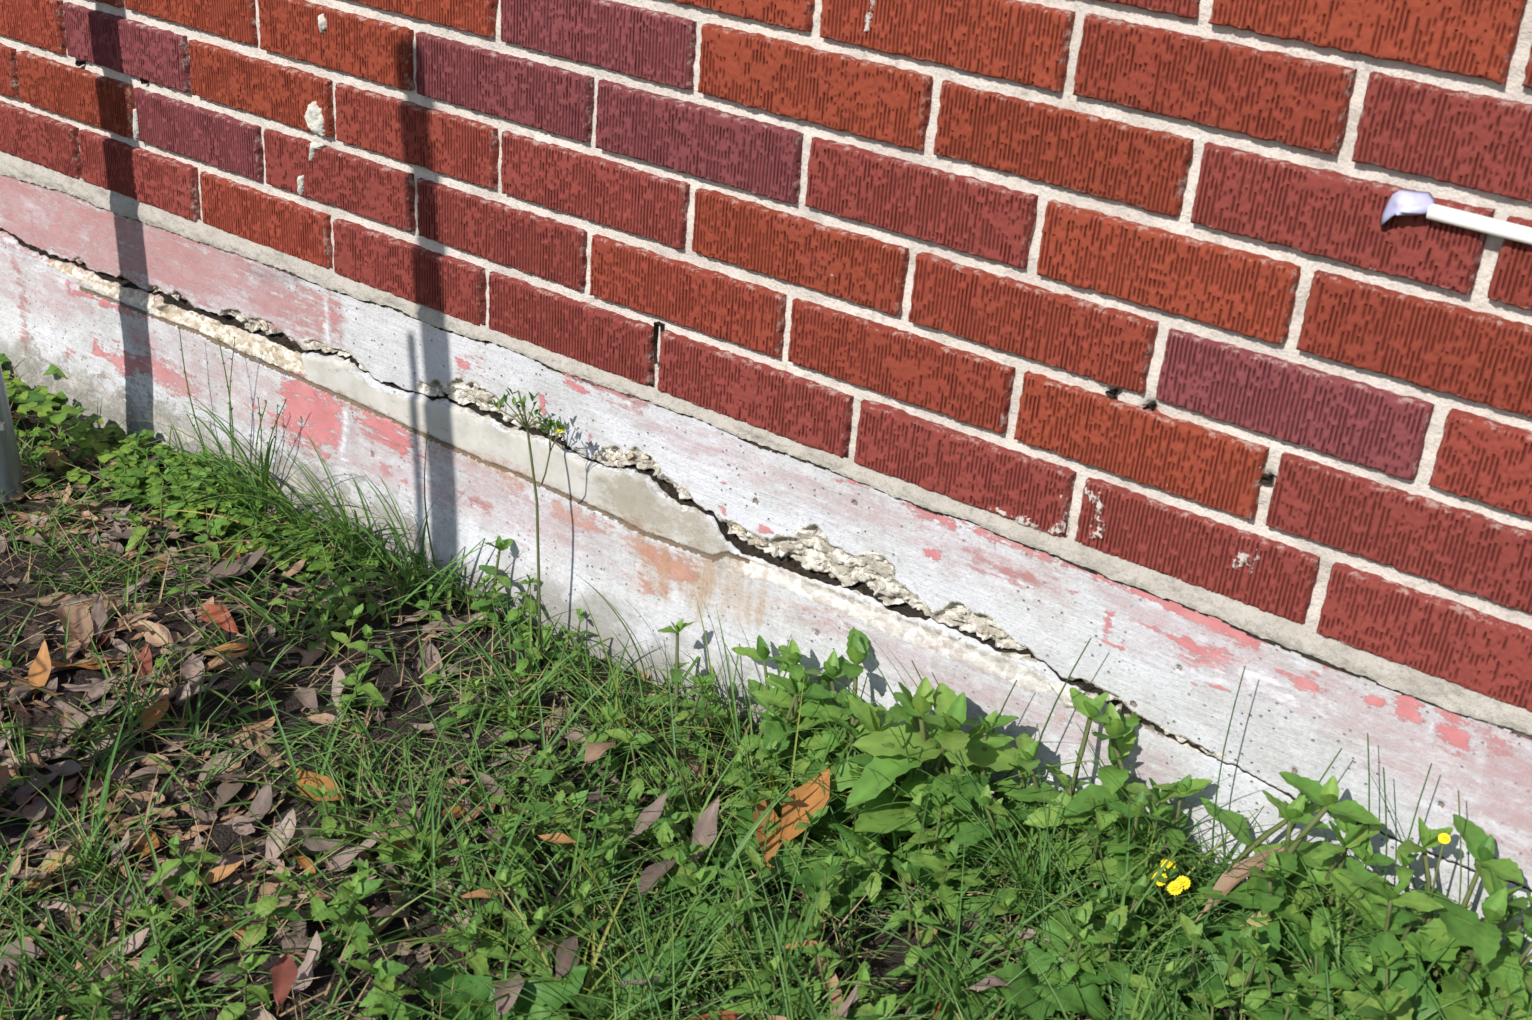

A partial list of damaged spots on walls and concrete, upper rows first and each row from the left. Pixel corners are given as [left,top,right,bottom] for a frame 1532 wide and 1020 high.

spalling [414,354,1040,663]
crack [0,177,1532,892]
peeling [900,502,1269,692]
spalling [1049,676,1225,760]